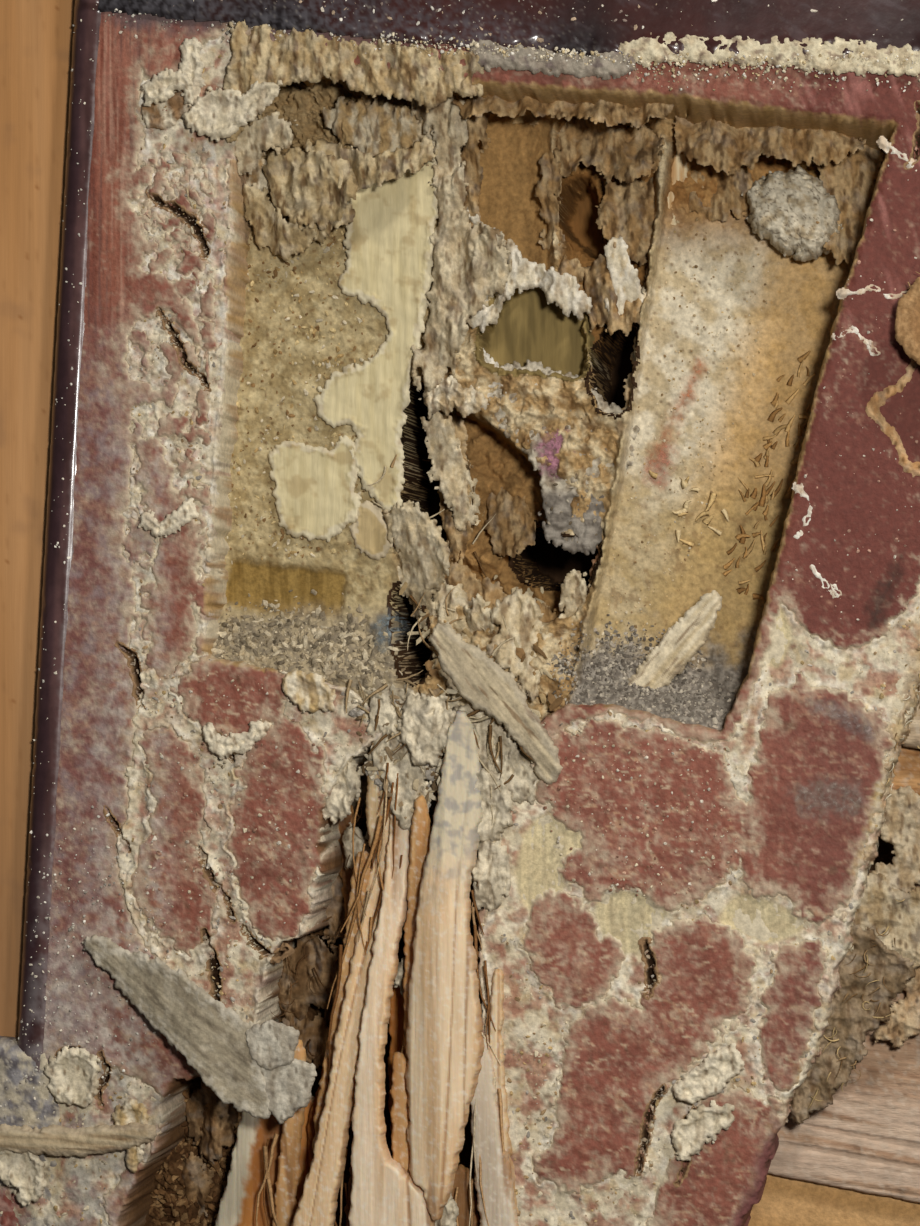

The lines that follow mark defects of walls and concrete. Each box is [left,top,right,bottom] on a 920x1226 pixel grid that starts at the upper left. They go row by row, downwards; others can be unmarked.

crack [145,189,211,260]
crack [155,306,211,395]
peeling [895,277,920,365]
spalling [116,20,885,1097]
crack [103,805,131,853]
peeling [469,584,920,1226]
crack [638,937,661,1000]
spalling [334,1095,355,1226]
spalling [384,1024,393,1157]
spalling [458,1105,481,1226]
crack [634,1083,697,1177]
crack [673,1156,692,1188]